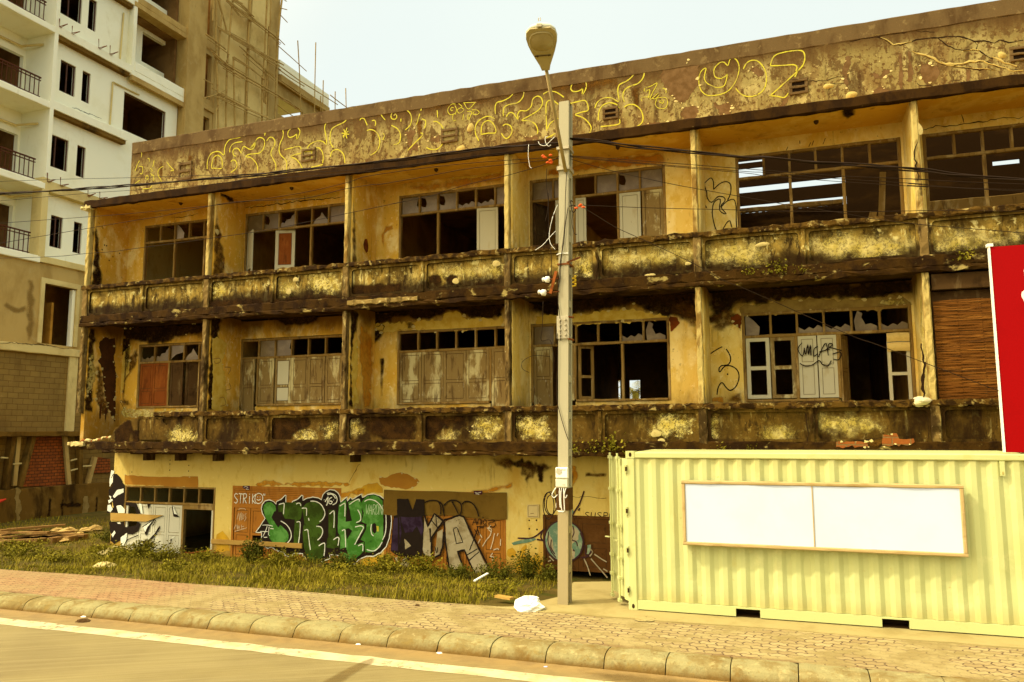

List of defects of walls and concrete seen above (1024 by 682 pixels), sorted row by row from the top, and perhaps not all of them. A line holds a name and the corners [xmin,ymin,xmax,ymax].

crack [850,31,1024,86]
peeling [645,59,701,125]
peeling [872,68,892,94]
peeling [405,127,440,153]
water stain [91,230,102,285]
water stain [609,245,687,266]
water stain [813,232,910,258]
peeling [87,337,183,421]
water stain [516,417,550,439]
water stain [649,413,693,437]
flaking render [836,433,915,448]
water stain [473,458,549,492]